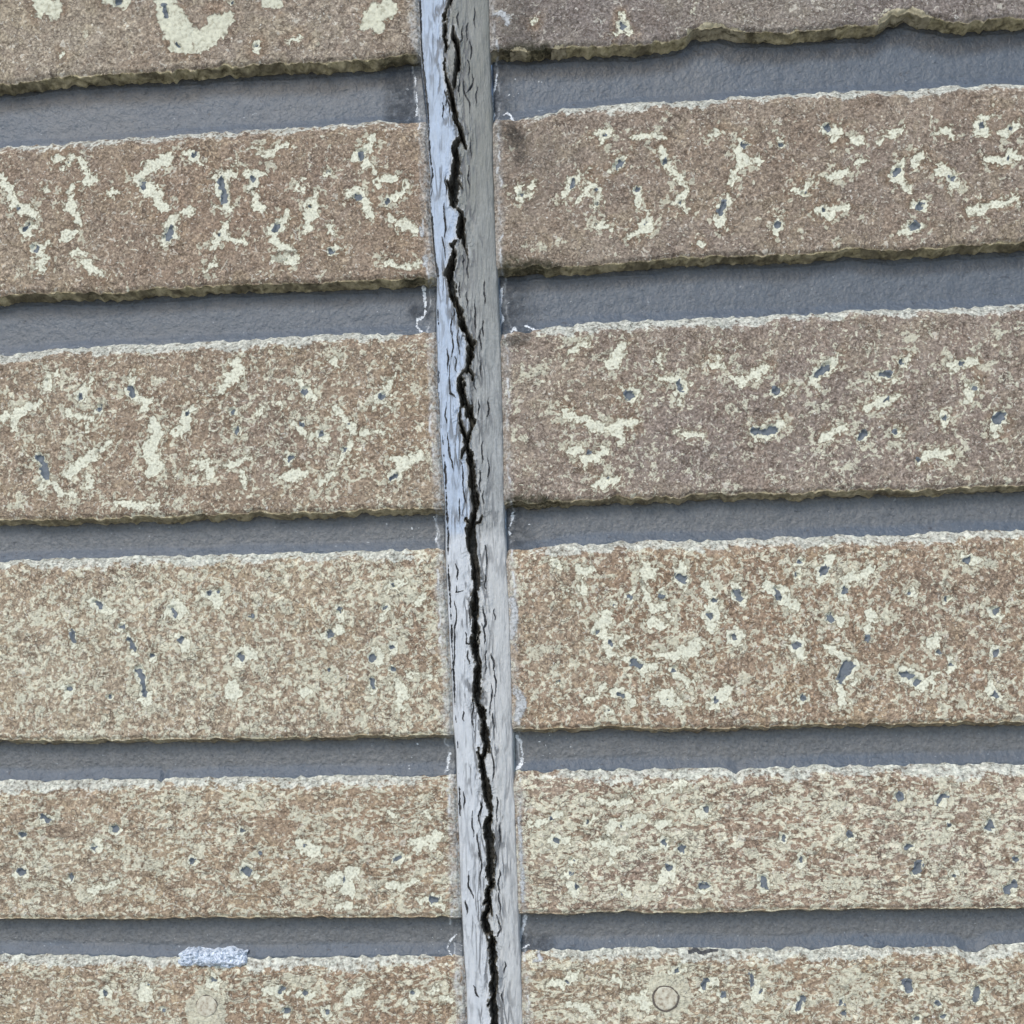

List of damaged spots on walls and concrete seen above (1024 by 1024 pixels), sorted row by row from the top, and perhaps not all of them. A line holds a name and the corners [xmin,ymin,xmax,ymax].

crack [419,0,516,1024]